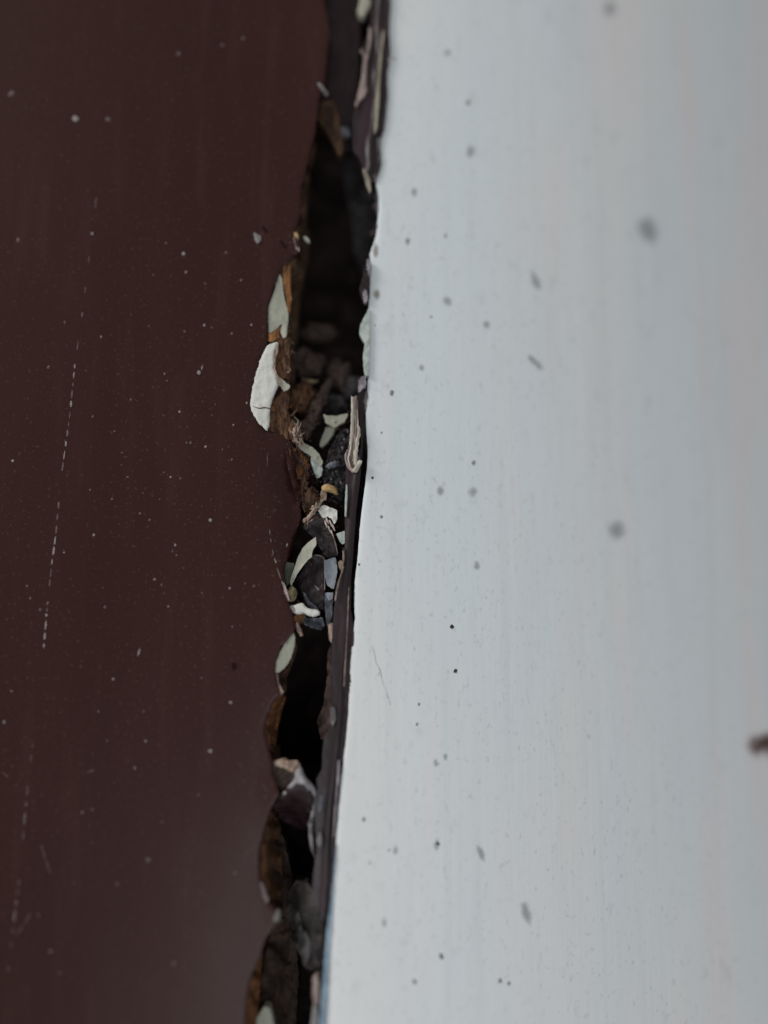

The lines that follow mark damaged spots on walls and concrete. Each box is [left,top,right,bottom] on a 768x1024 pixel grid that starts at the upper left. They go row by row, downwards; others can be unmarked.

peeling [355,0,384,134]
peeling [363,169,377,237]
peeling [286,232,310,256]
peeling [250,274,291,431]
peeling [358,259,371,393]
peeling [286,427,335,501]
peeling [318,490,345,544]
peeling [285,537,317,586]
peeling [290,592,333,617]
peeling [275,633,295,695]
peeling [257,1001,276,1024]
peeling [310,971,320,1024]